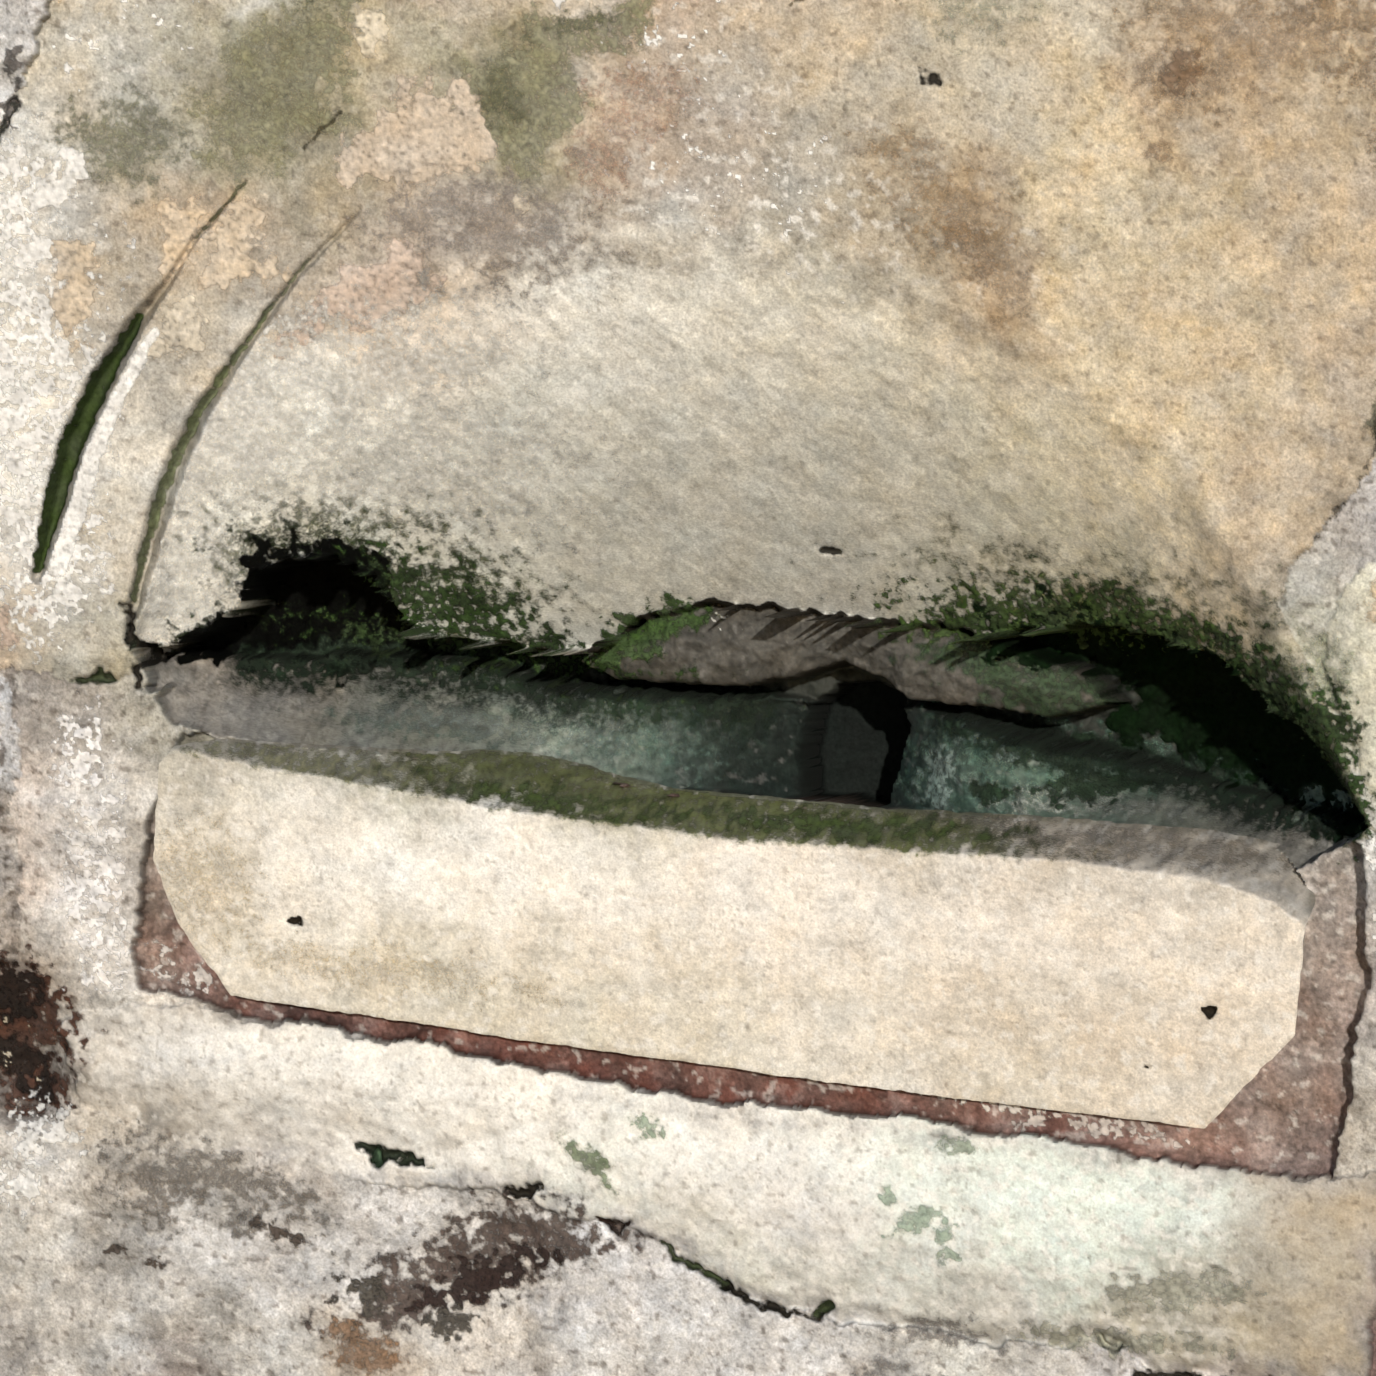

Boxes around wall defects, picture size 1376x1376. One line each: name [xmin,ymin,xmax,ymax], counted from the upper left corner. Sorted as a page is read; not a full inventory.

crack [71,602,201,689]
damp [157,498,782,745]
damp [435,705,1359,873]
crack [505,1182,544,1200]
crack [595,1216,631,1234]
crack [661,1240,835,1322]